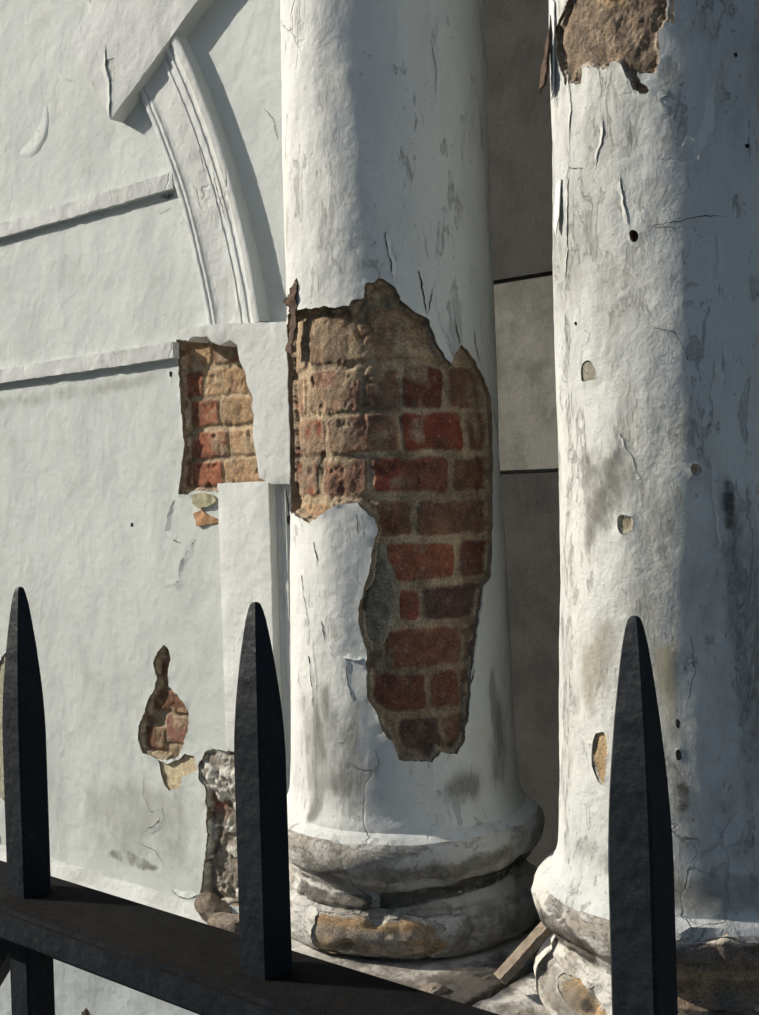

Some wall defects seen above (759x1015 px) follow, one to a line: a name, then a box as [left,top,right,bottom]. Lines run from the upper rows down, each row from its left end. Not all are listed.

crack [102,45,111,118]
peeling [539,0,675,127]
flaking render [170,340,265,526]
flaking render [283,278,489,762]
flaking render [140,646,239,904]
peeling [592,732,608,786]
peeling [311,911,447,959]
peeling [676,934,759,1015]